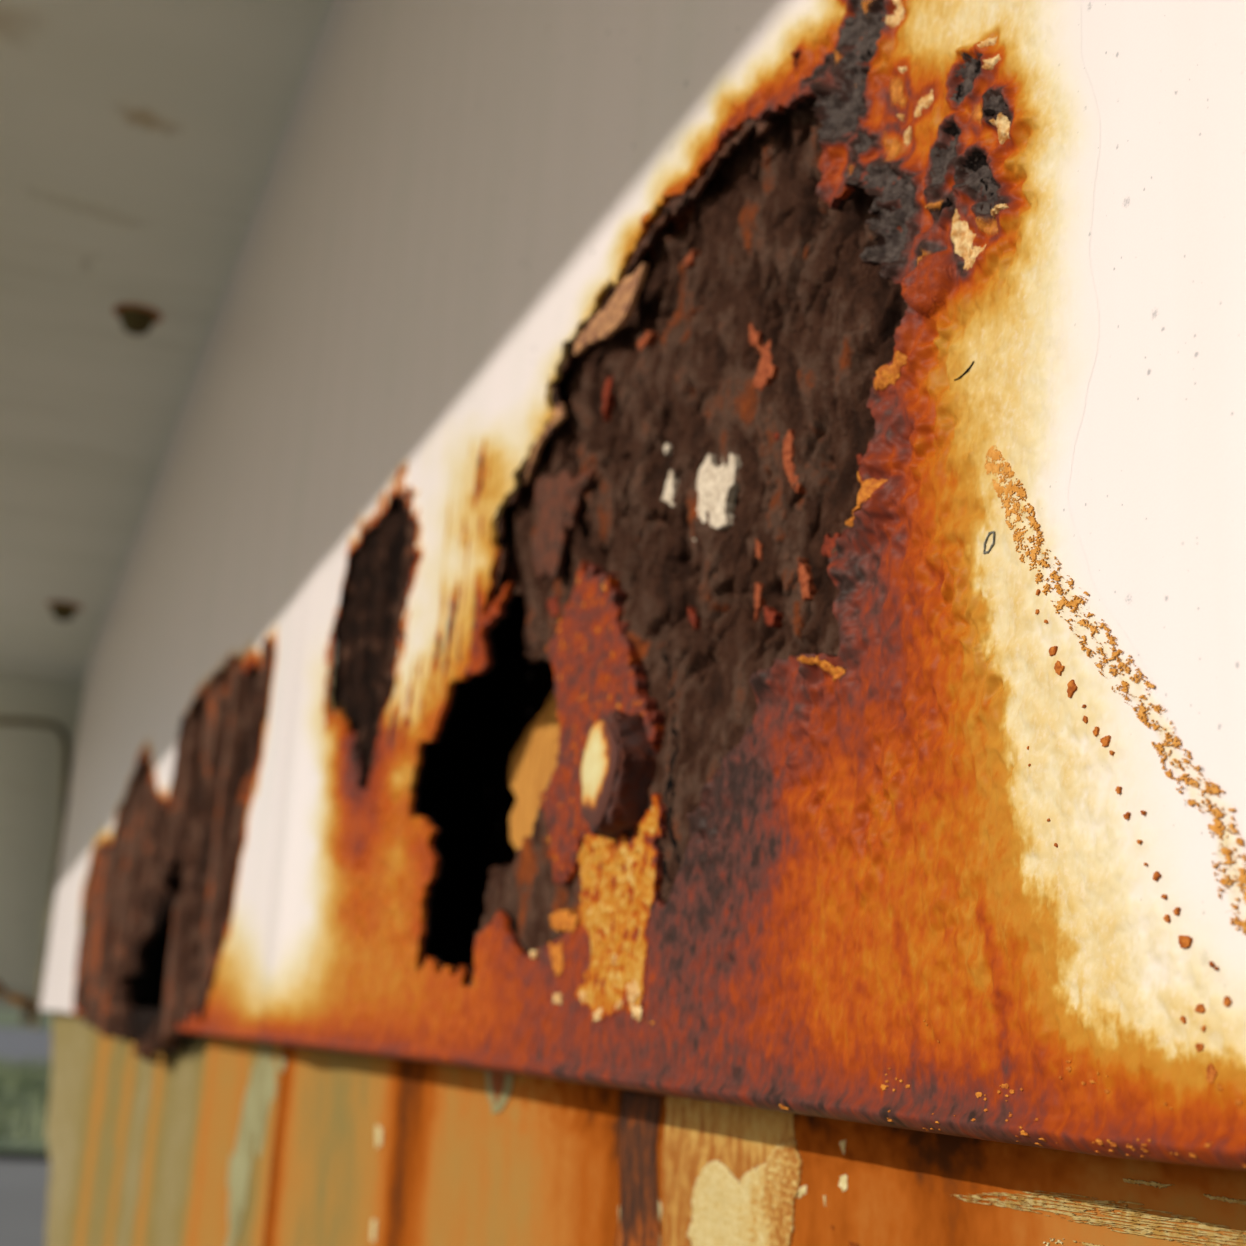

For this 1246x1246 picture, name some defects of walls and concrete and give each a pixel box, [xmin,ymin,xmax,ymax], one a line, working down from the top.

corrosion [1054,661,1065,676]
corrosion [1067,679,1078,698]
spalling [472,627,555,969]
corrosion [45,1011,206,1246]
peeling [226,1048,287,1246]
corrosion [182,1036,394,1246]
corrosion [377,1058,623,1246]
corrosion [616,1090,661,1246]
corrosion [654,1094,667,1246]
peeling [658,1096,807,1246]
peeling [838,1174,848,1192]
corrosion [790,1114,1246,1246]